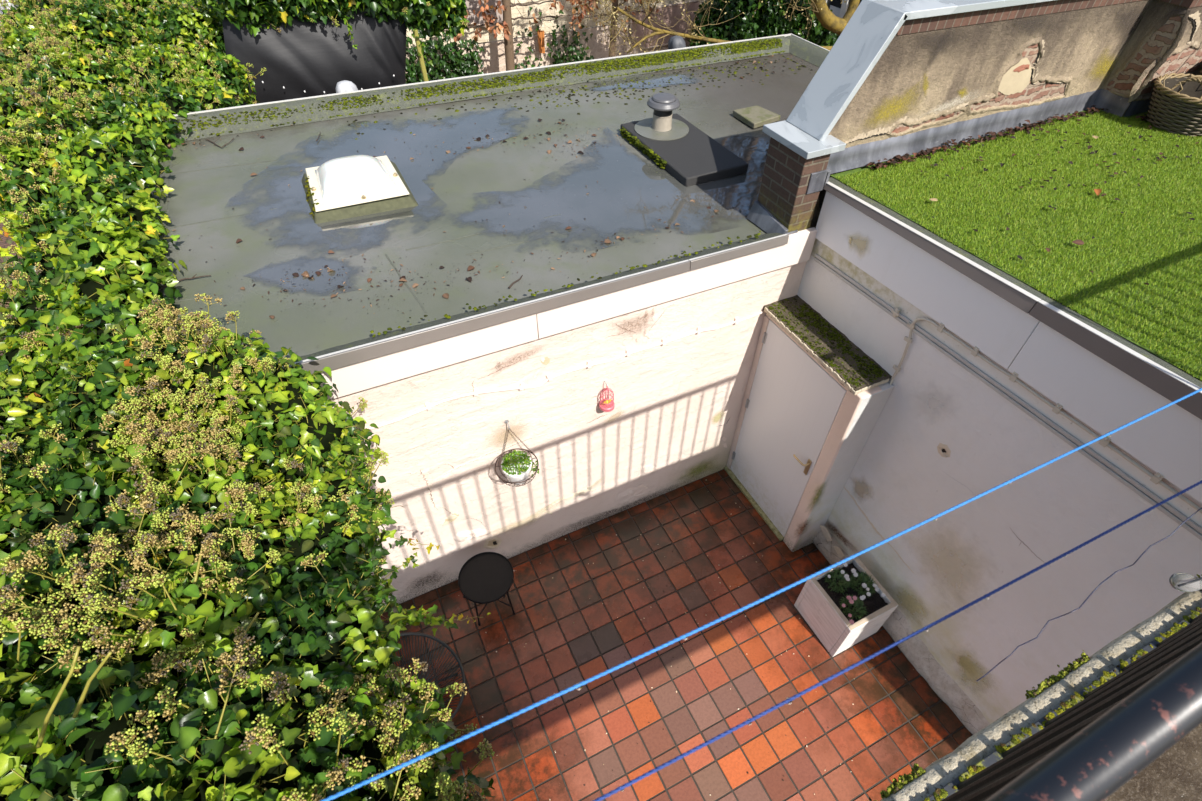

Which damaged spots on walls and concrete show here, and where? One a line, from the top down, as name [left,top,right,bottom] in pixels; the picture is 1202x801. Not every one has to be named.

spalling [886,37,1072,138]
spalling [1101,10,1202,103]